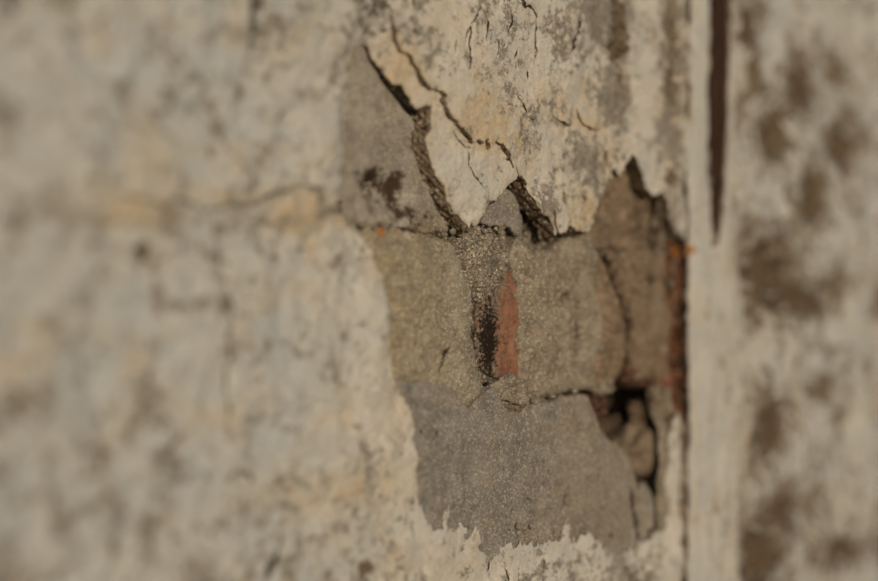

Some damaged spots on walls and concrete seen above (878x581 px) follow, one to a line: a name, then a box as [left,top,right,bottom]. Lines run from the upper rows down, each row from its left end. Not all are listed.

crack [455,0,582,120]
peeling [664,159,688,235]
spalling [334,0,683,572]
spalling [358,552,373,581]